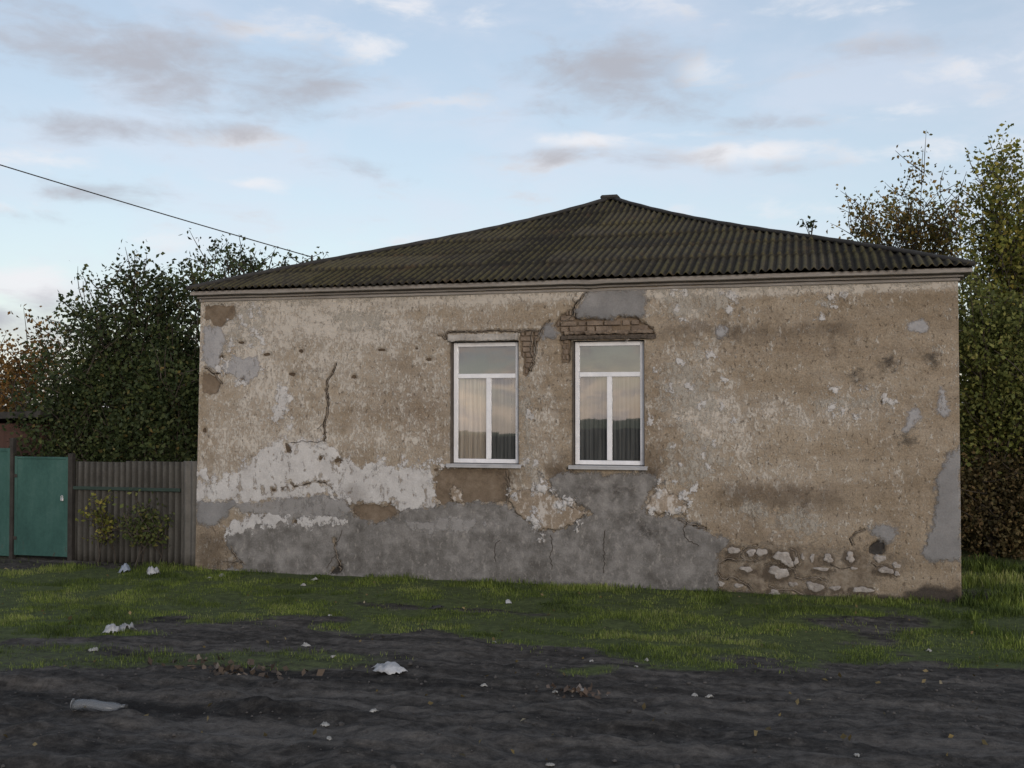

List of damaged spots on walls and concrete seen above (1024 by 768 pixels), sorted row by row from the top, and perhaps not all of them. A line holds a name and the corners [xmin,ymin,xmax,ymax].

spalling [202,299,322,394]
crack [291,363,337,443]
peeling [197,372,515,542]
flaking render [516,330,544,485]
flaking render [554,311,653,363]
peeling [646,340,739,517]